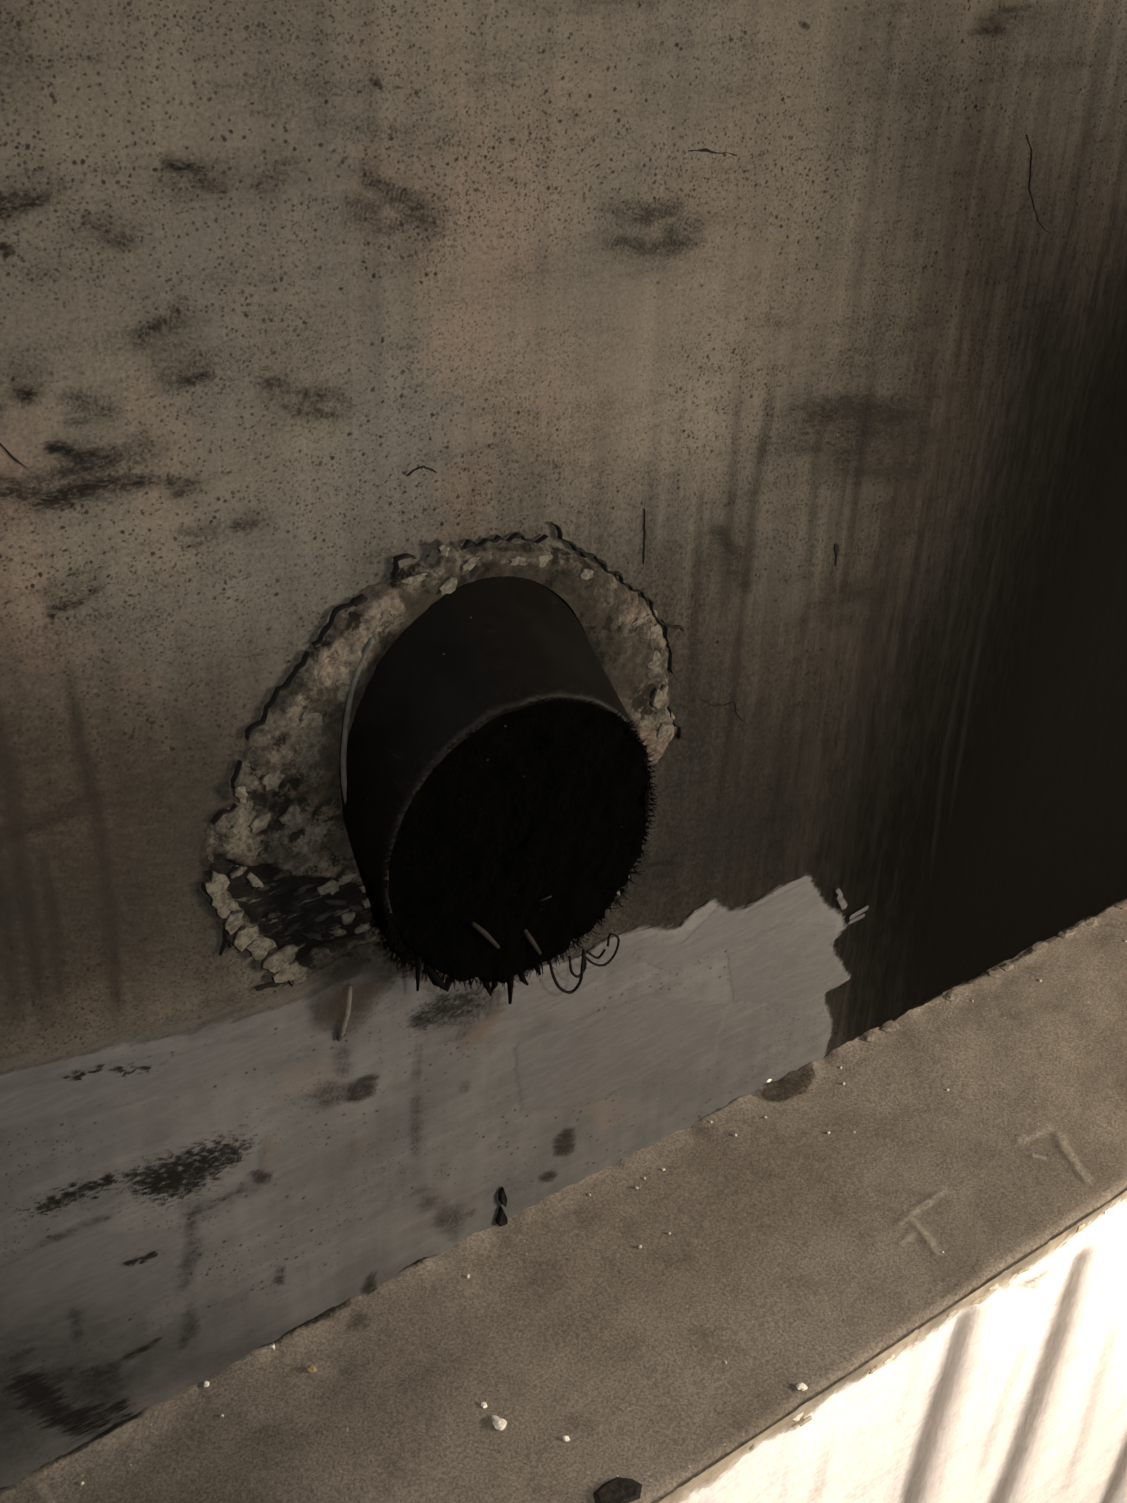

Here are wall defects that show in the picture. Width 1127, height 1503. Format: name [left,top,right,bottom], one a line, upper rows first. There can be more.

peeling [400,544,480,596]
peeling [509,554,553,567]
peeling [579,568,594,580]
peeling [632,614,662,668]
peeling [652,684,671,742]
peeling [234,770,327,837]
spalling [201,860,382,991]